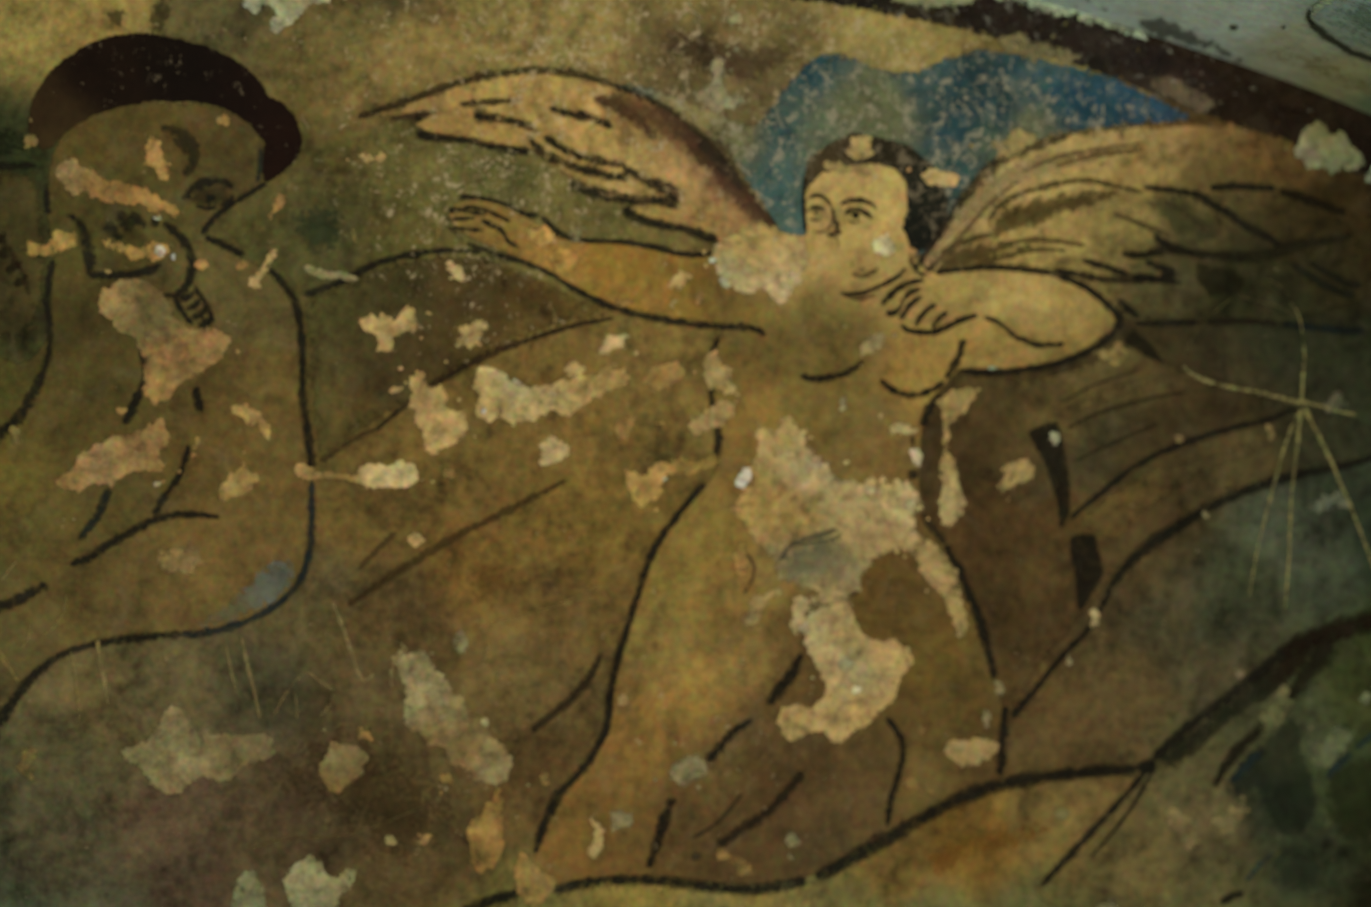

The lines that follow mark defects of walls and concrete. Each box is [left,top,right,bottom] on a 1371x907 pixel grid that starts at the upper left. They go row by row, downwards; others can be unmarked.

flaking render [242,0,330,34]
flaking render [55,136,179,220]
flaking render [1284,110,1371,183]
flaking render [667,220,810,305]
flaking render [54,269,241,494]
flaking render [294,306,740,489]
flaking render [624,454,717,512]
flaking render [731,387,981,743]
flaking render [121,705,276,795]
flaking render [390,649,556,907]
flaking render [944,709,1000,768]
flaking render [283,855,357,907]